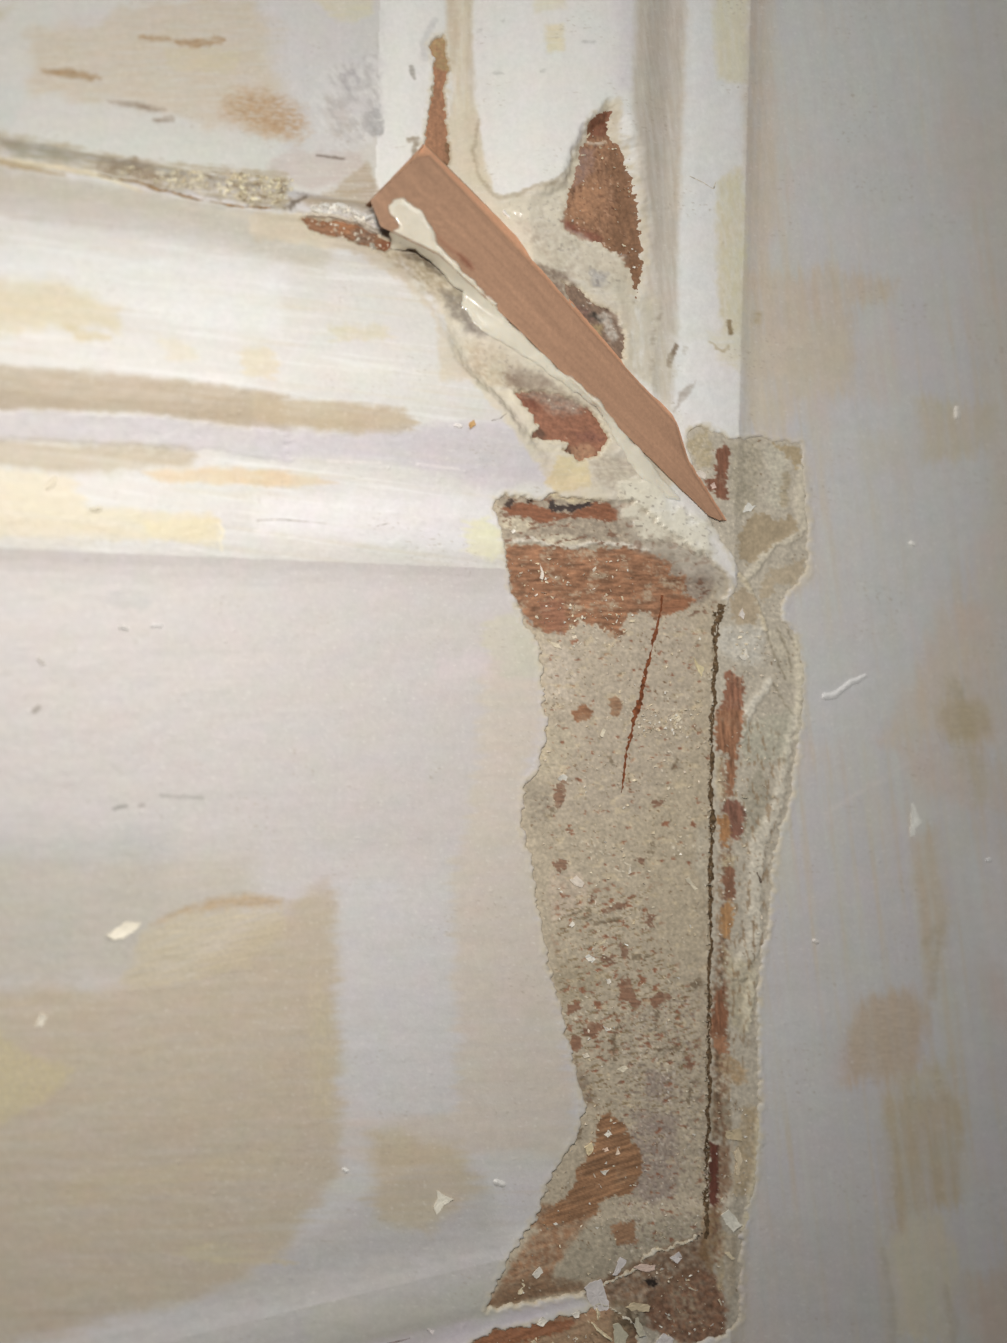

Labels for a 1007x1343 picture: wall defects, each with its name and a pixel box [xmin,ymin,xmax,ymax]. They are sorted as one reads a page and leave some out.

peeling [425,37,450,165]
peeling [565,111,644,299]
peeling [565,284,624,359]
peeling [515,391,608,461]
crack [621,595,663,793]
peeling [473,427,809,1343]
crack [702,604,726,1239]
peeling [434,1191,454,1215]